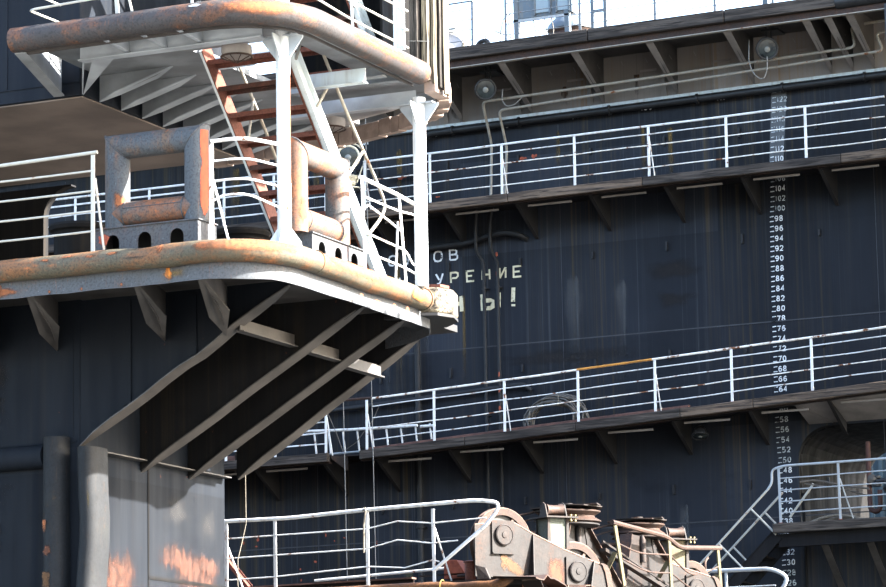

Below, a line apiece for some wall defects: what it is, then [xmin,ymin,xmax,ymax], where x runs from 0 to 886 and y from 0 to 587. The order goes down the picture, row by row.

rust [224,0,293,14]
rust [287,199,307,222]
rust [332,258,391,283]
rust [42,572,50,587]
rust [108,557,132,587]
rust [165,547,217,587]
rust [501,555,523,575]
rust [549,560,563,582]